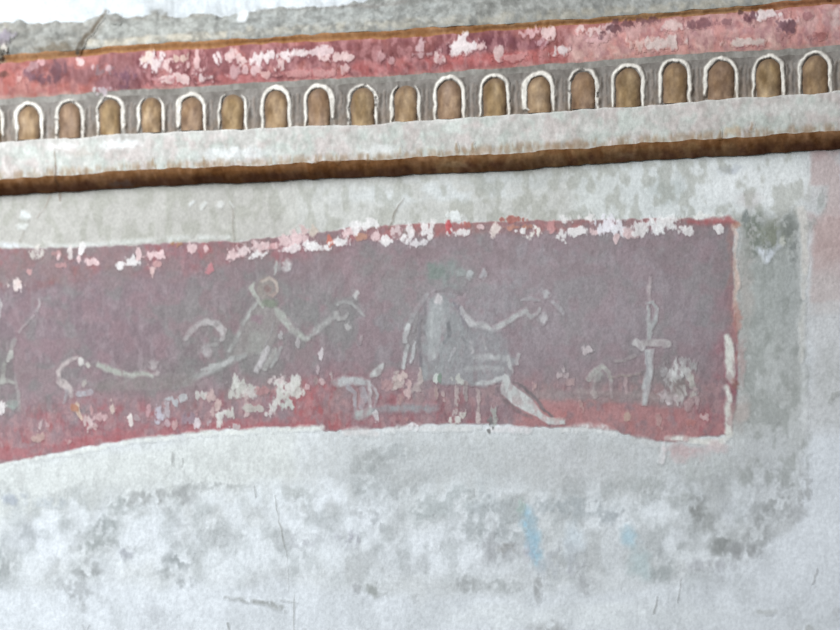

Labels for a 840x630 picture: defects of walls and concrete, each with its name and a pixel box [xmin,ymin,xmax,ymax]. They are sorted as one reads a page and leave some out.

spalling [0,27,19,62]
spalling [235,8,250,25]
peeling [138,43,356,86]
peeling [374,48,395,66]
peeling [411,24,572,68]
peeling [574,22,611,47]
peeling [624,17,690,55]
peeling [718,35,783,49]
peeling [740,7,801,26]
peeling [225,209,732,263]
peeling [114,240,215,279]
peeling [70,346,334,434]